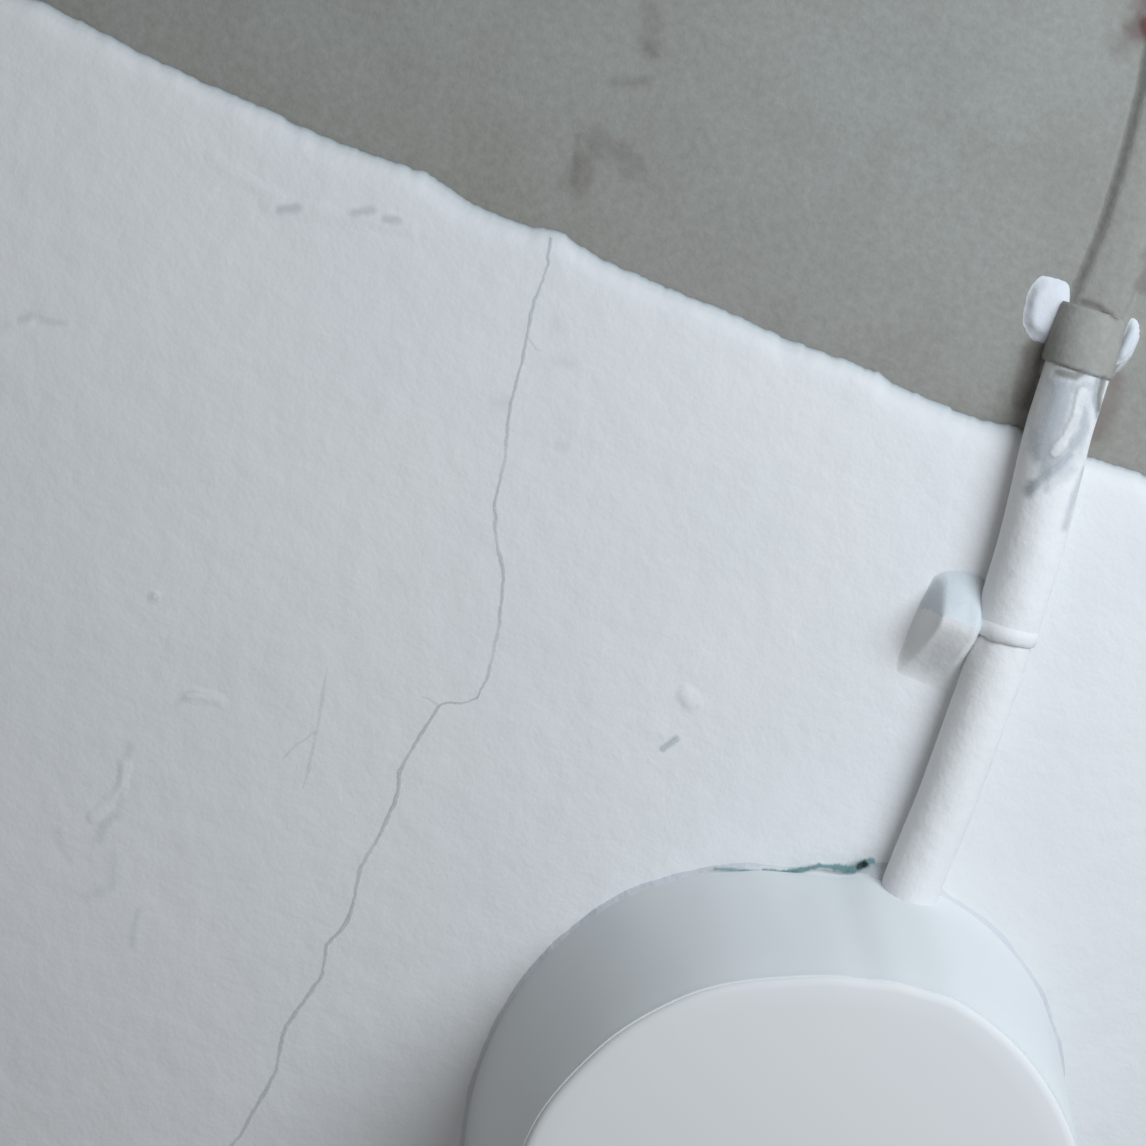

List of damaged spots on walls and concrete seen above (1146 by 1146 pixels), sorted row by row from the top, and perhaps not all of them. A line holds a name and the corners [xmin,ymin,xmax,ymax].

crack [507,237,553,435]
peeling [1028,370,1107,494]
crack [494,480,505,620]
crack [377,669,491,840]
crack [237,875,360,1139]